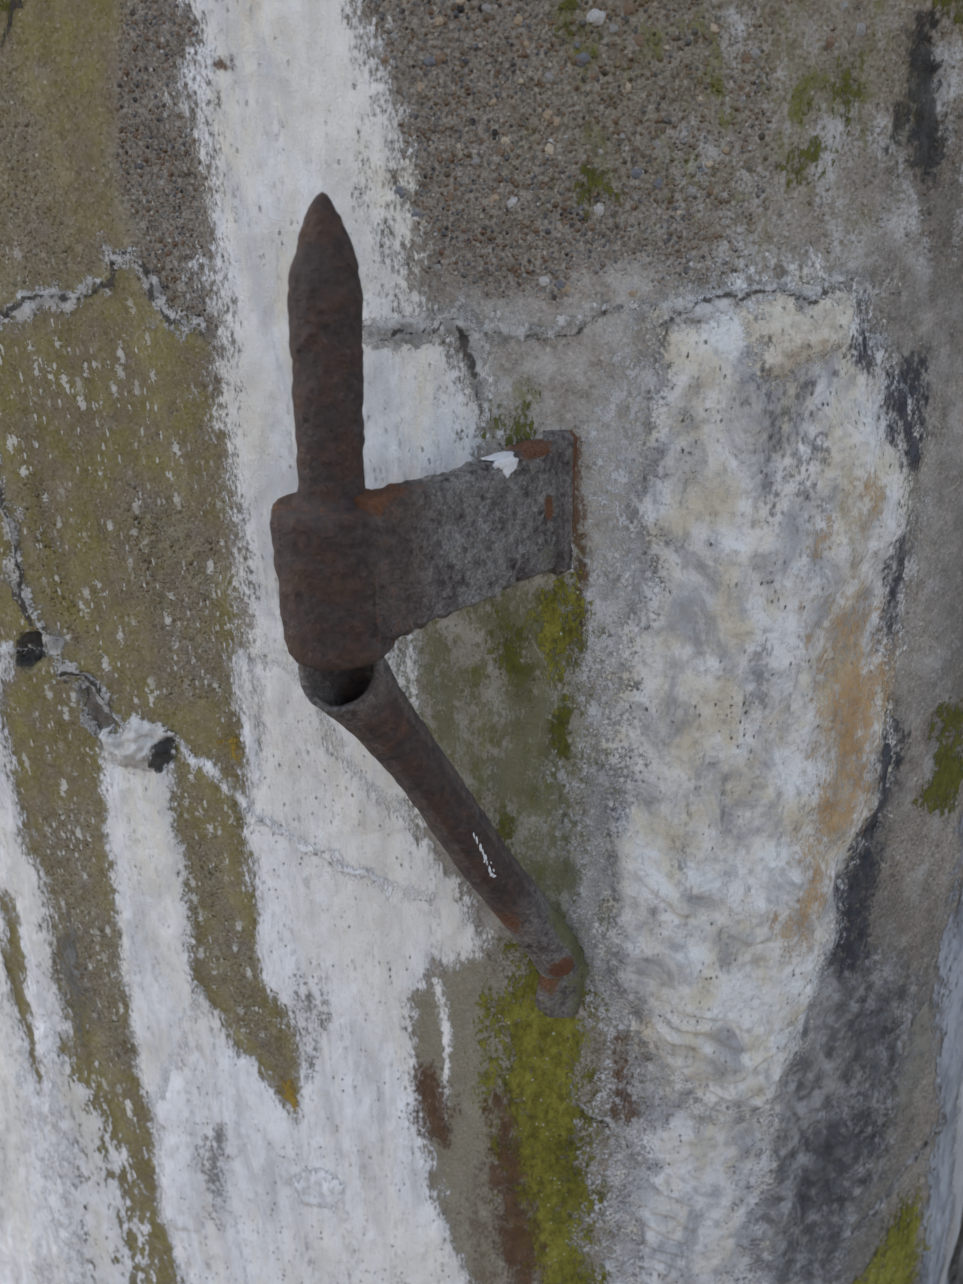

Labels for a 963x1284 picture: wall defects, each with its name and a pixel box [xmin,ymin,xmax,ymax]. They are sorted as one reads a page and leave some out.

spalling [586,2,644,47]
spalling [876,1,952,190]
spalling [394,186,426,227]
spalling [489,189,518,207]
spalling [557,191,604,231]
crack [0,231,213,345]
corrosion [571,426,590,643]
crack [0,453,123,750]
damp [535,255,963,1284]
corrosion [410,1060,461,1149]
corrosion [480,1084,552,1284]